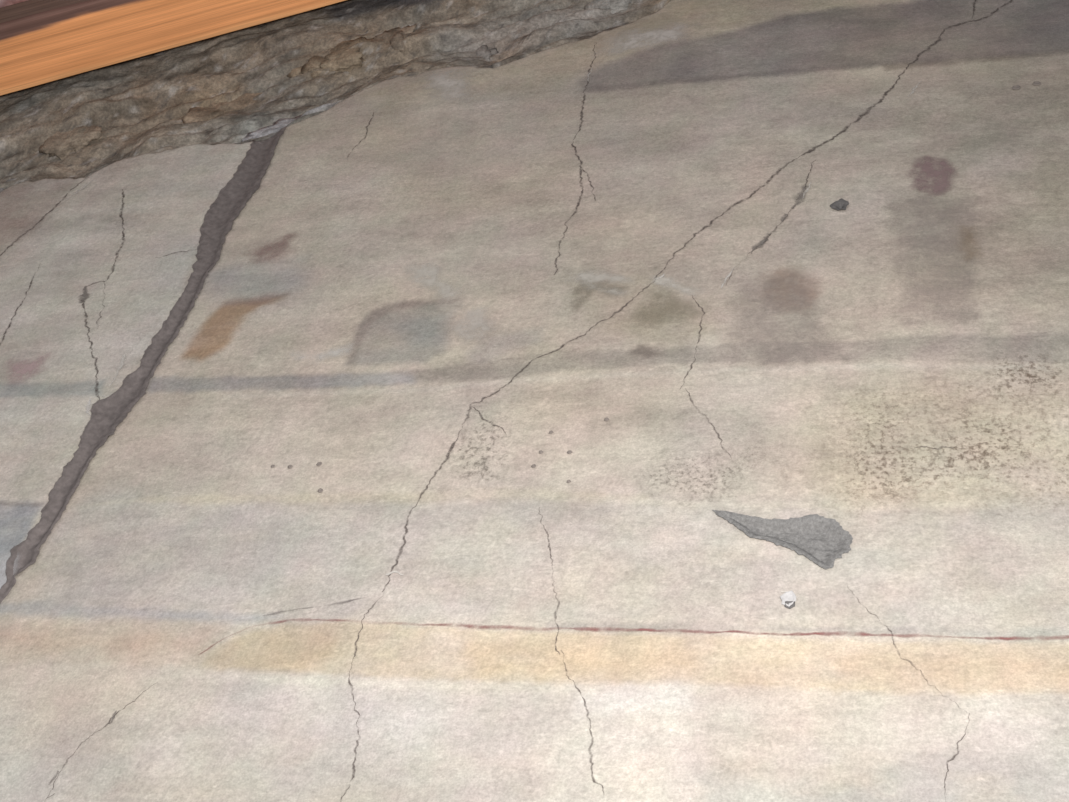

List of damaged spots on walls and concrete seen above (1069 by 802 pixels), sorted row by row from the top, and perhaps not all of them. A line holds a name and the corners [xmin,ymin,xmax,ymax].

crack [0,126,286,604]
crack [341,440,457,799]
crack [467,0,1012,431]
flaking render [713,510,853,569]
water stain [915,157,954,193]